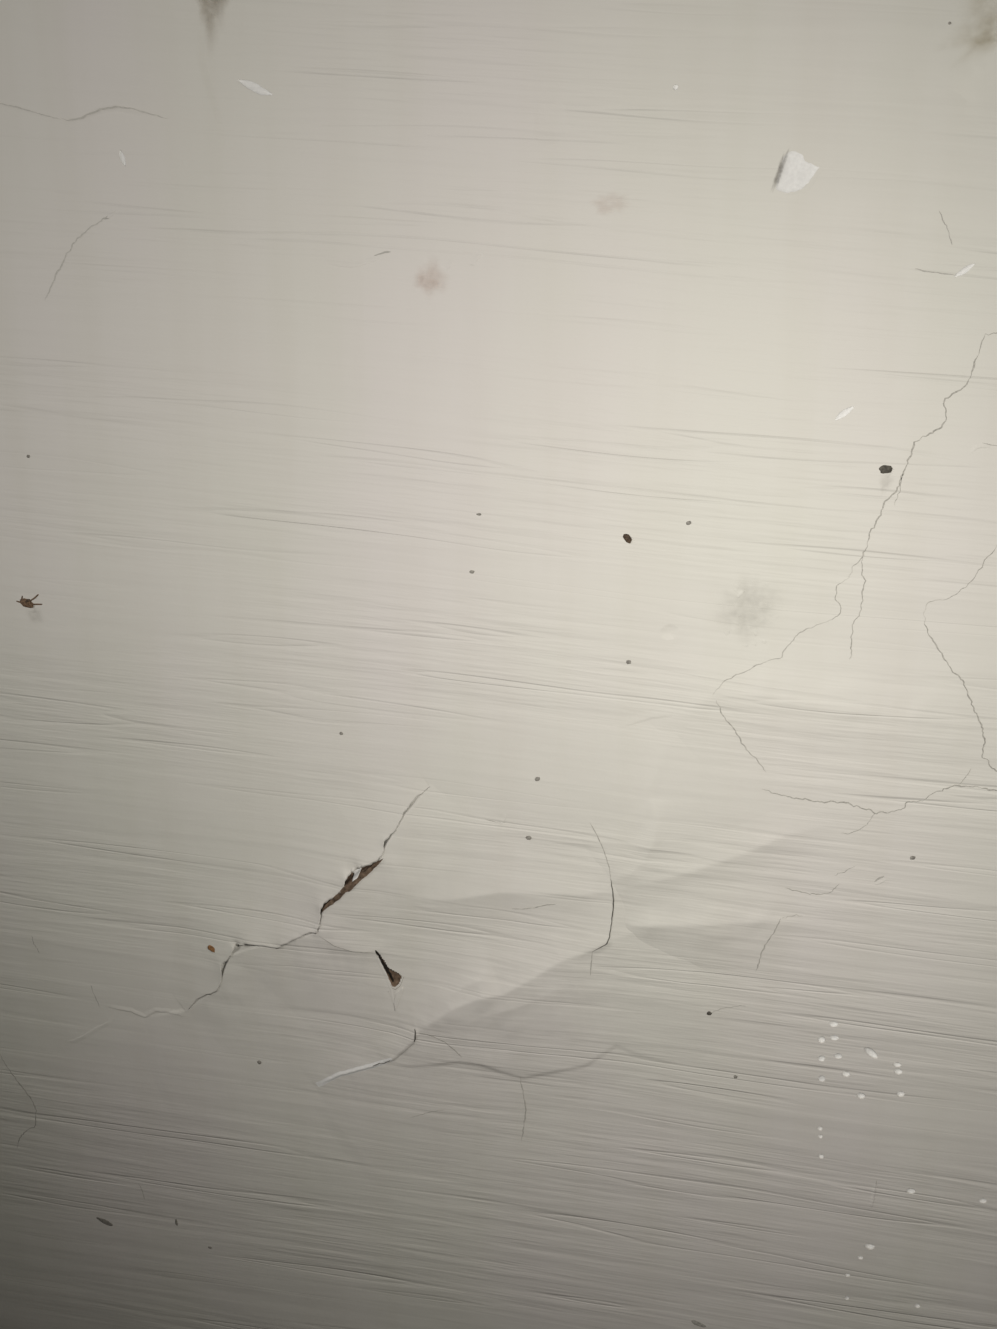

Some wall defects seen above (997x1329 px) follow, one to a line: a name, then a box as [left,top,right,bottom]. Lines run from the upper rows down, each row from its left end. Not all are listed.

peeling [776,151,820,198]
crack [714,332,997,834]
crack [756,866,855,970]